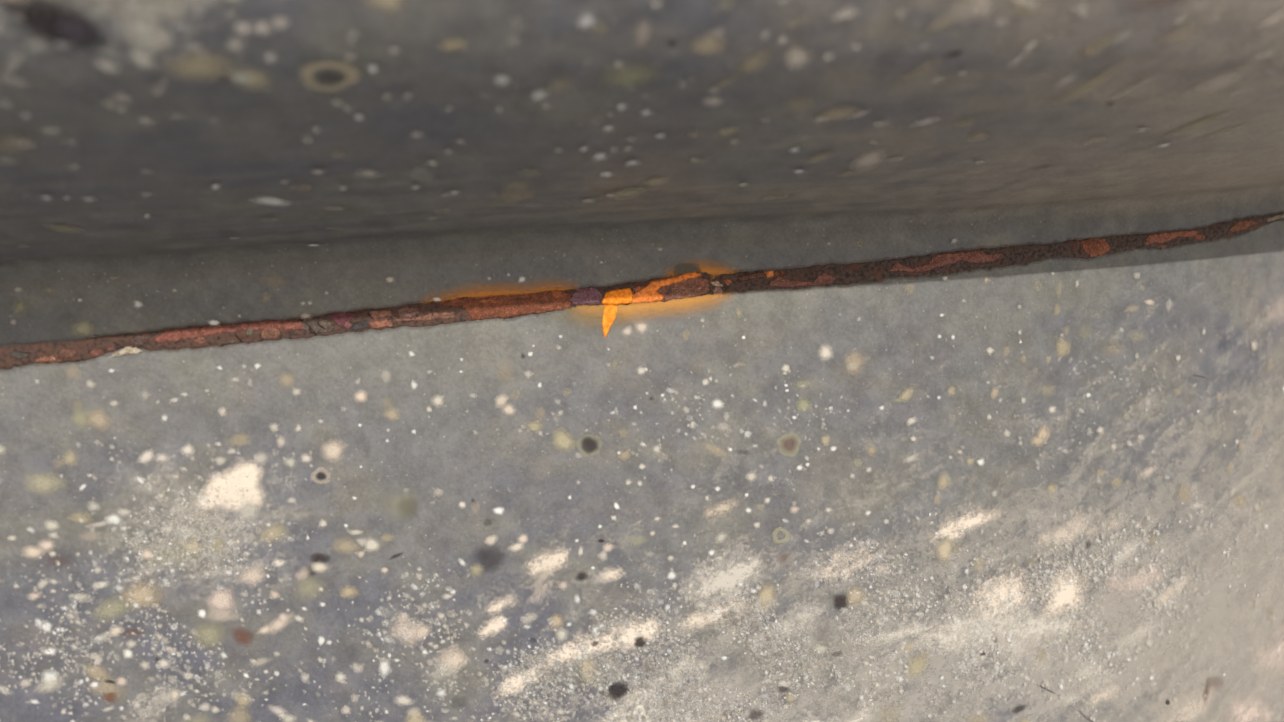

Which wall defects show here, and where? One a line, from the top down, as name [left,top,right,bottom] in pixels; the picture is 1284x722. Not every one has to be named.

corrosion [1072,238,1110,257]
corrosion [1145,230,1205,249]
corrosion [890,250,1003,273]
corrosion [154,265,836,345]
corrosion [35,346,115,363]